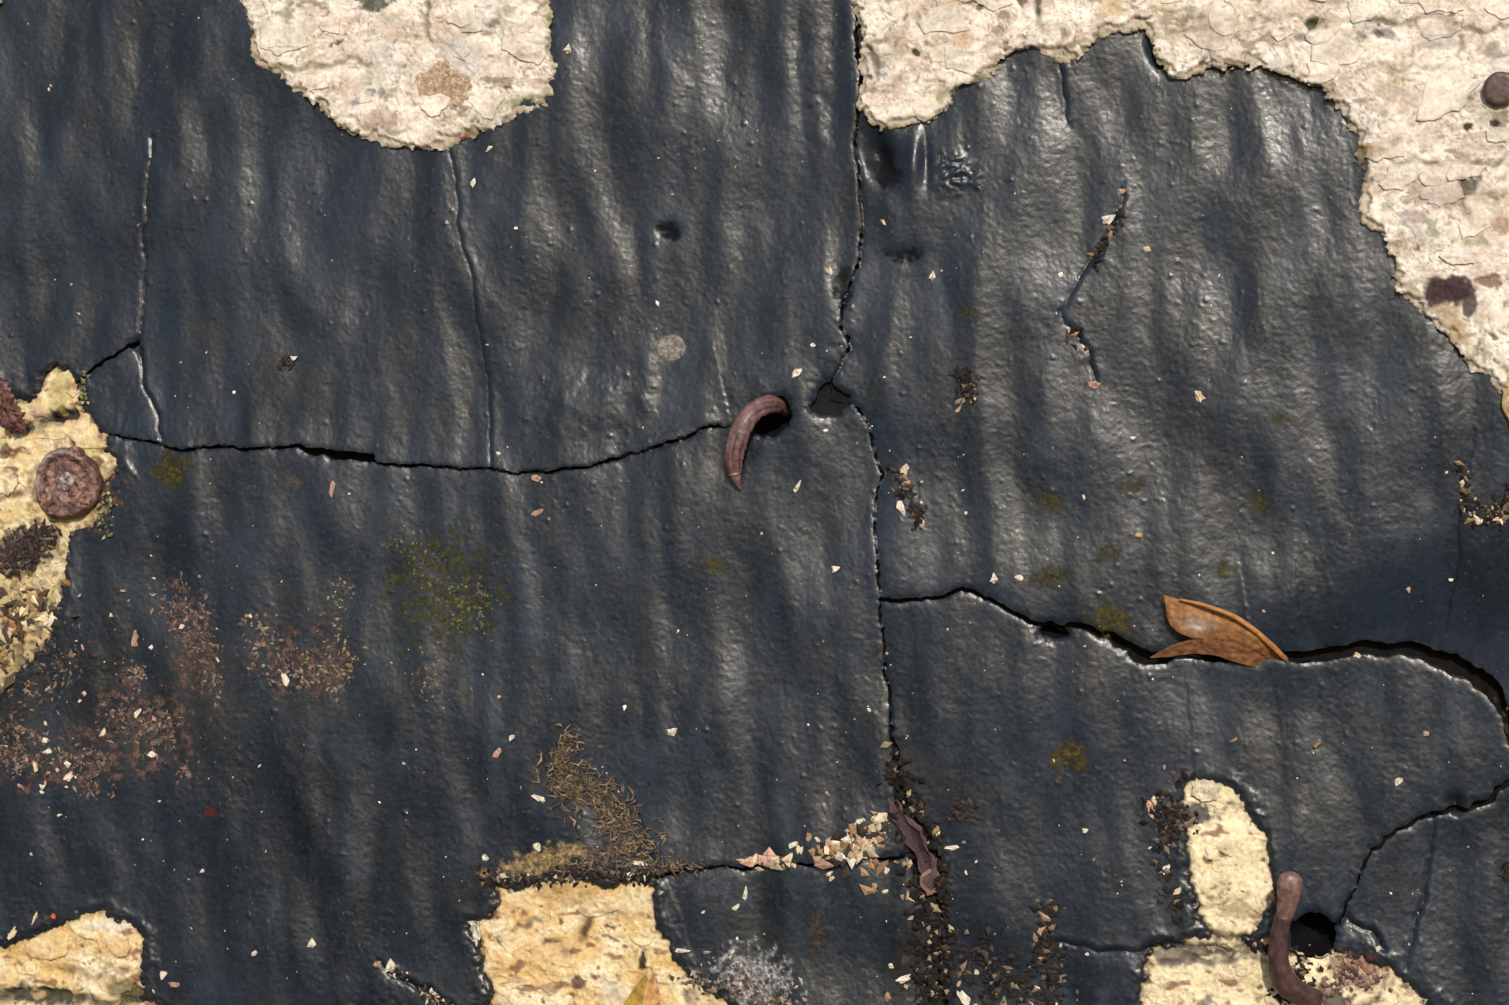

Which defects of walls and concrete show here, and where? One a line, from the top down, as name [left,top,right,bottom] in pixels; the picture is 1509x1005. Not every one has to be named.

corrosion [0,380,27,435]
peeling [240,0,558,151]
crack [84,138,720,474]
crack [855,18,863,197]
crack [1061,185,1125,378]
peeling [850,0,1509,421]
peeling [0,365,120,693]
crack [656,234,1233,1002]
crack [1281,430,1509,962]
peeling [0,909,157,1005]
peeling [468,875,728,1005]
peeling [1139,778,1297,1005]